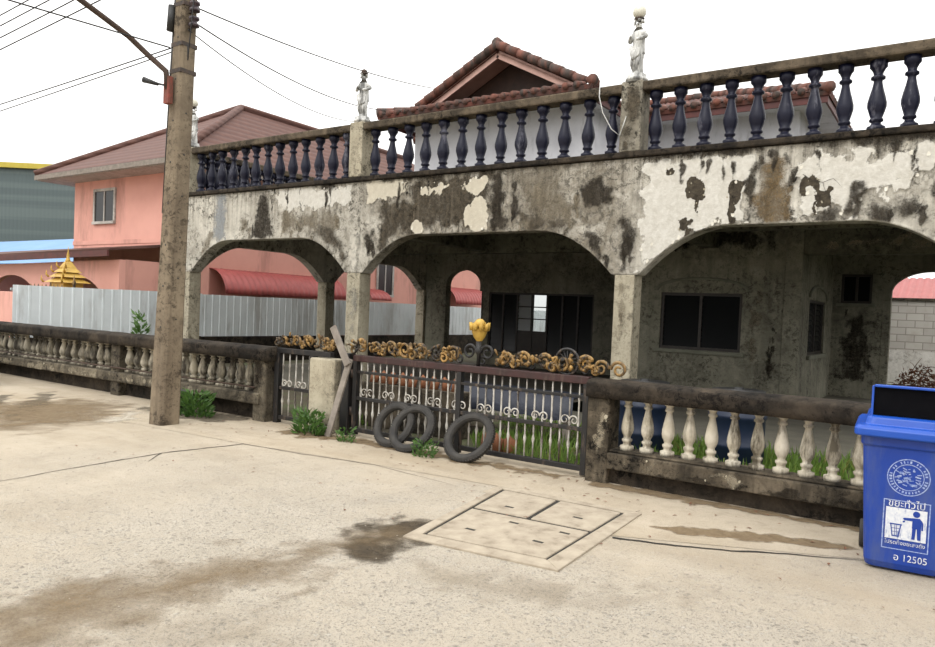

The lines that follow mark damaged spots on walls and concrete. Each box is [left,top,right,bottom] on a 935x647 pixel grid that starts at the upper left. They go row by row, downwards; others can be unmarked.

water stain [242,184,345,268]
peeling [366,179,408,204]
peeling [420,182,449,196]
peeling [462,175,489,232]
water stain [356,168,612,262]
water stain [618,217,636,272]
peeling [633,152,756,273]
water stain [648,147,799,251]
peeling [793,139,935,221]
water stain [809,132,935,175]
water stain [813,180,935,226]
water stain [331,518,430,563]